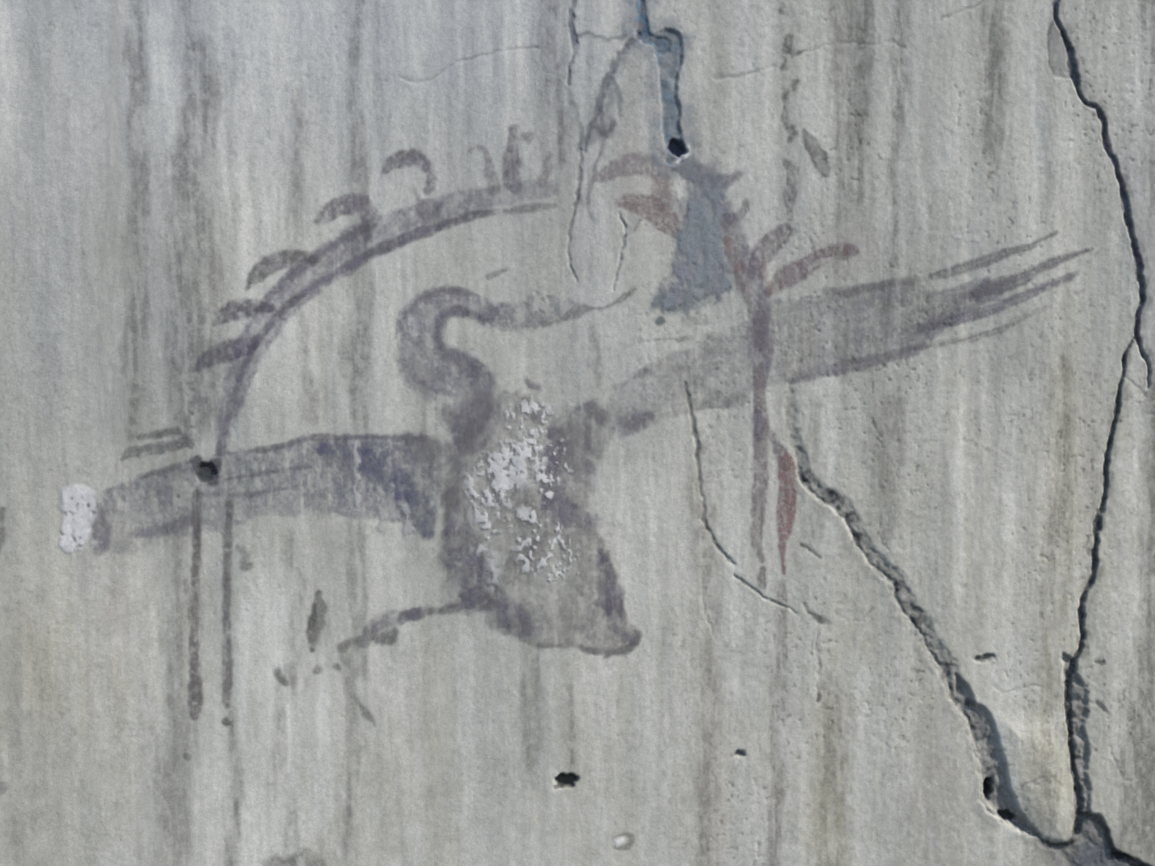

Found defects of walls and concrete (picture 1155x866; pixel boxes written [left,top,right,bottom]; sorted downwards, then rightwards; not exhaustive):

crack [569,15,577,44]
crack [587,76,613,135]
crack [624,0,680,165]
crack [687,396,700,456]
crack [1052,0,1149,837]
flaking render [59,485,96,553]
flaking render [465,401,578,591]
crack [788,391,1033,835]
flaking render [1042,813,1145,866]